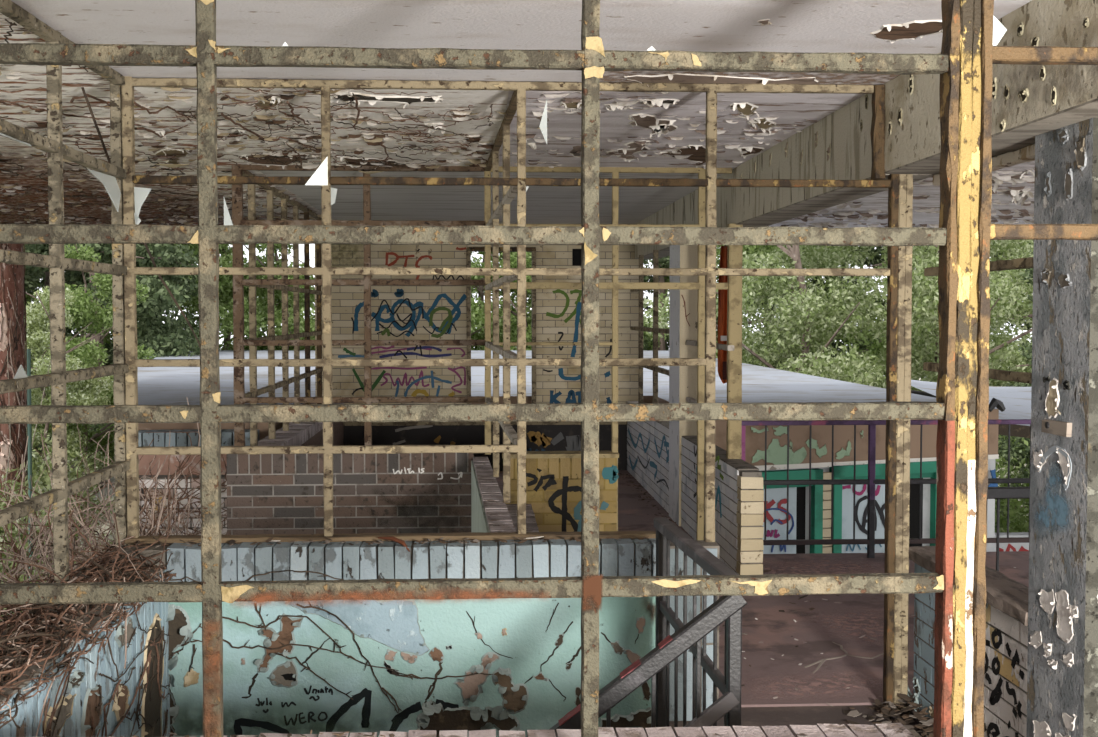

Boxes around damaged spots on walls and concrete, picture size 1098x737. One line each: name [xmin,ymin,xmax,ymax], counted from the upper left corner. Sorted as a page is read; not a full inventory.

peeling [584,37,605,79]
peeling [871,20,943,43]
peeling [217,88,582,174]
peeling [600,52,831,179]
crack [242,673,258,699]
crack [302,638,330,670]
peeling [241,600,453,688]
crack [424,662,443,703]
peeling [416,652,549,737]
crack [466,603,639,700]
peeling [600,681,651,734]
peeling [1028,589,1078,670]